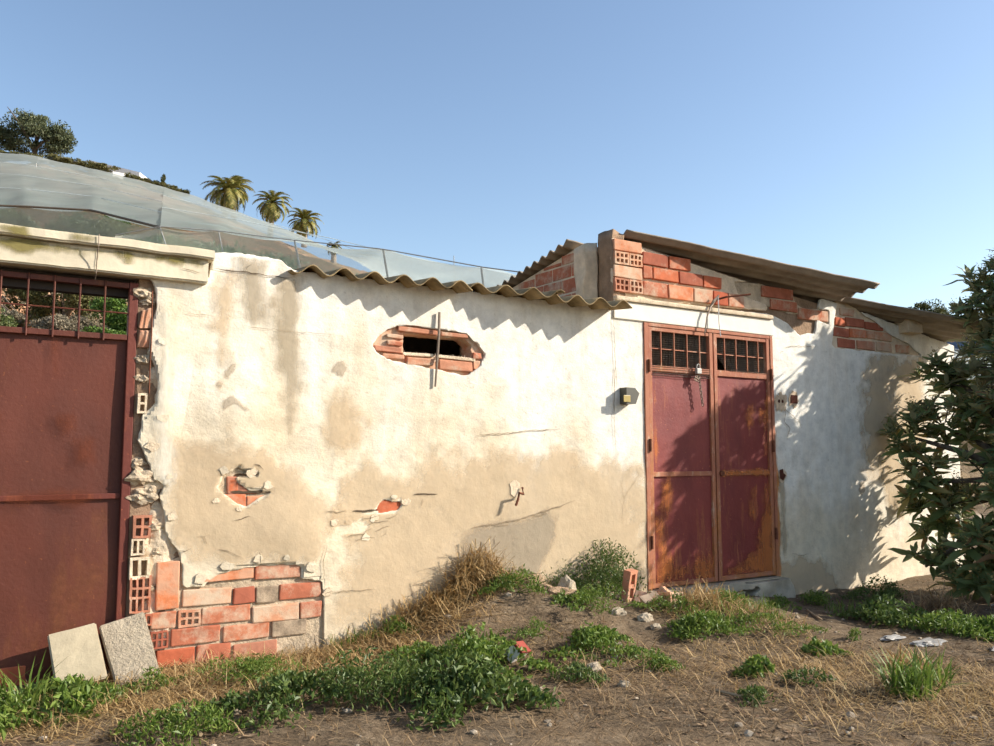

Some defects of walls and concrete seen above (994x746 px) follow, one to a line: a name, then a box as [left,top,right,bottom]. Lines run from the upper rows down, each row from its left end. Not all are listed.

spalling [133,287,170,422]
water stain [240,257,266,320]
water stain [277,280,298,412]
spalling [610,238,920,356]
spalling [124,441,333,669]
spalling [370,495,411,522]
water stain [157,312,647,617]